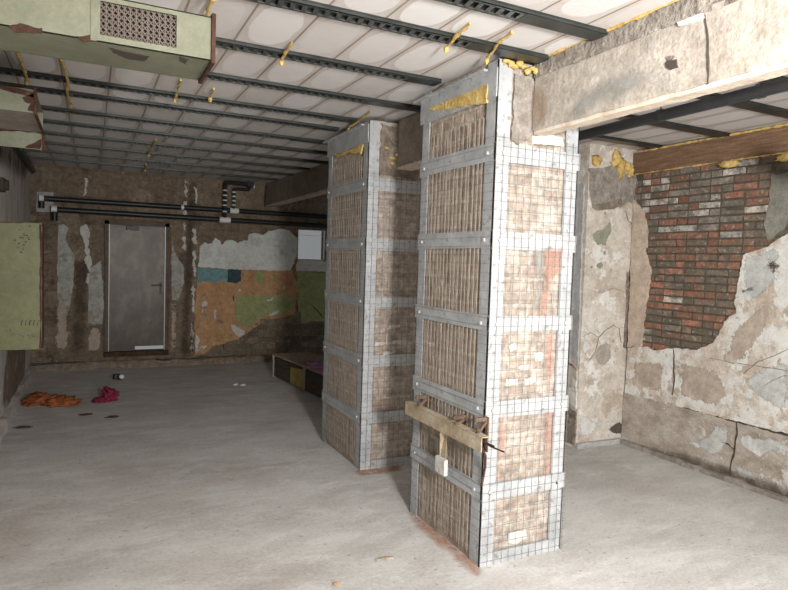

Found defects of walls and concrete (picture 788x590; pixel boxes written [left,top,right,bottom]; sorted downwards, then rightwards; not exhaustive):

peeling [55,224,75,349]
peeling [88,260,104,351]
peeling [194,229,326,356]
spalling [583,155,788,457]
crack [670,349,788,471]